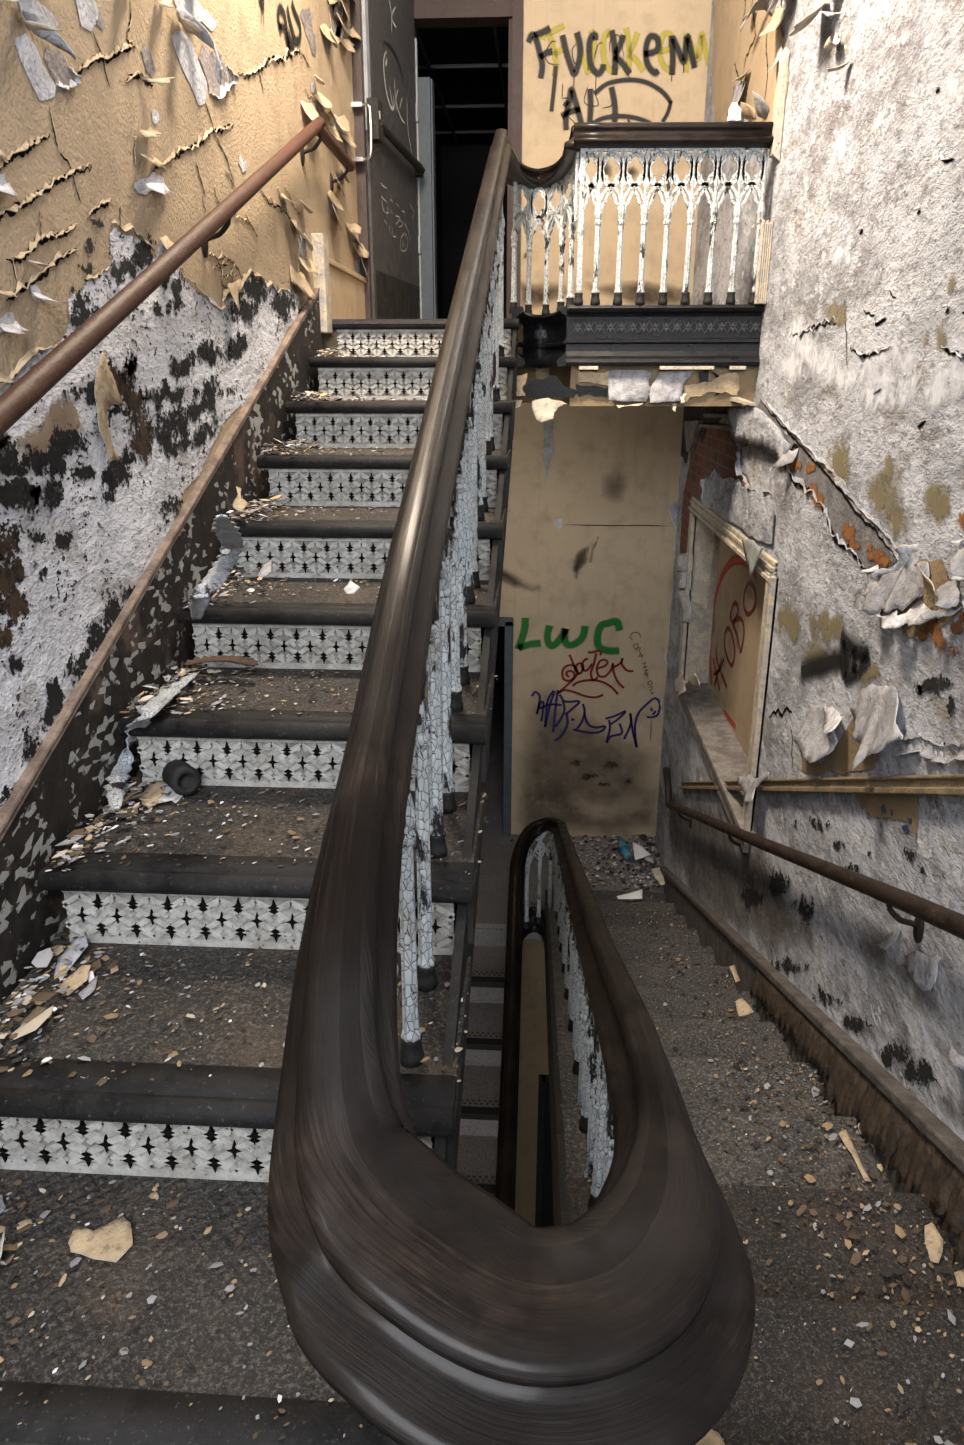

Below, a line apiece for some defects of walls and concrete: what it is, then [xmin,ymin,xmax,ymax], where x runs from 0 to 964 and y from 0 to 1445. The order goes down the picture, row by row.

peeling [6,0,83,101]
peeling [76,0,106,32]
peeling [140,0,239,105]
peeling [300,0,361,57]
peeling [740,0,846,71]
peeling [0,74,369,810]
flaking render [516,366,791,623]
crack [757,395,898,573]
peeling [860,539,964,638]
peeling [794,684,964,775]
peeling [54,935,97,1000]
peeling [729,965,964,1288]